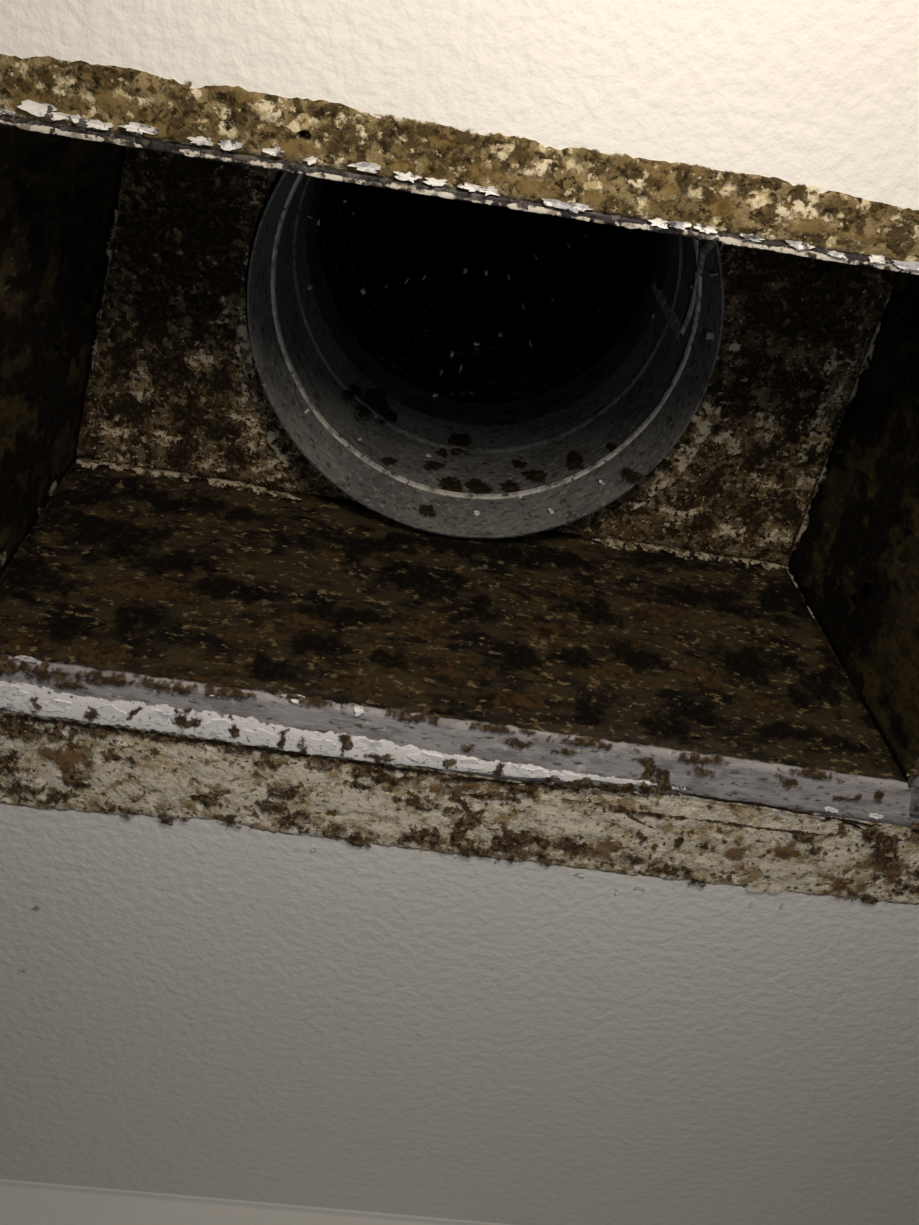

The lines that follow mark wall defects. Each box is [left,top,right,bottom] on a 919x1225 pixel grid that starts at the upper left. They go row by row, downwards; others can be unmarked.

damp [0,59,919,604]
damp [612,248,919,781]
damp [277,525,592,624]
damp [0,601,390,808]
damp [386,696,613,756]
damp [100,800,188,826]
damp [190,791,254,829]
damp [225,724,713,867]
damp [621,831,706,887]
damp [791,831,828,856]
damp [775,765,885,803]
damp [847,822,919,905]